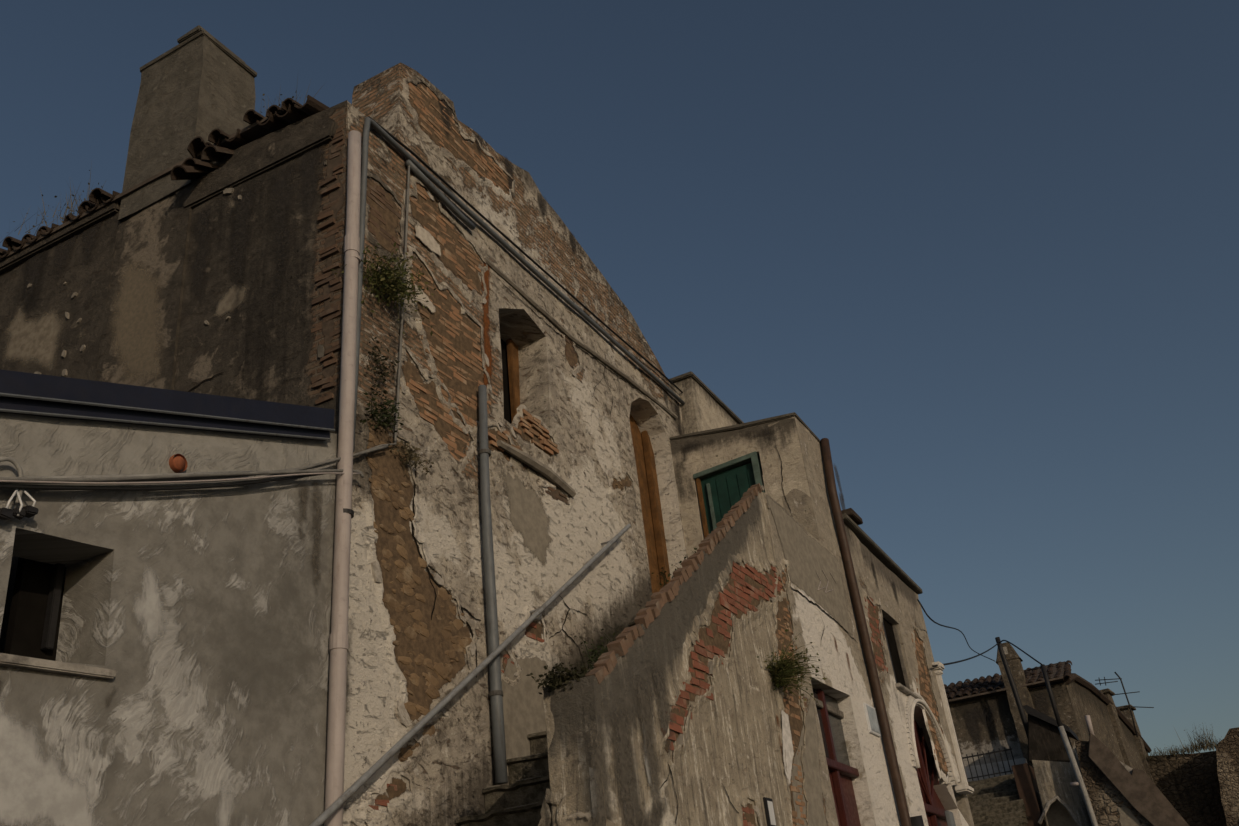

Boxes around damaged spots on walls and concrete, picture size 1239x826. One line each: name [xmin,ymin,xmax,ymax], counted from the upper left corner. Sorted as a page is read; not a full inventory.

flaking render [401,74,516,202]
flaking render [561,324,582,377]
flaking render [343,170,576,826]
flaking render [657,553,809,826]
flaking render [864,591,888,680]
flaking render [538,788,618,826]